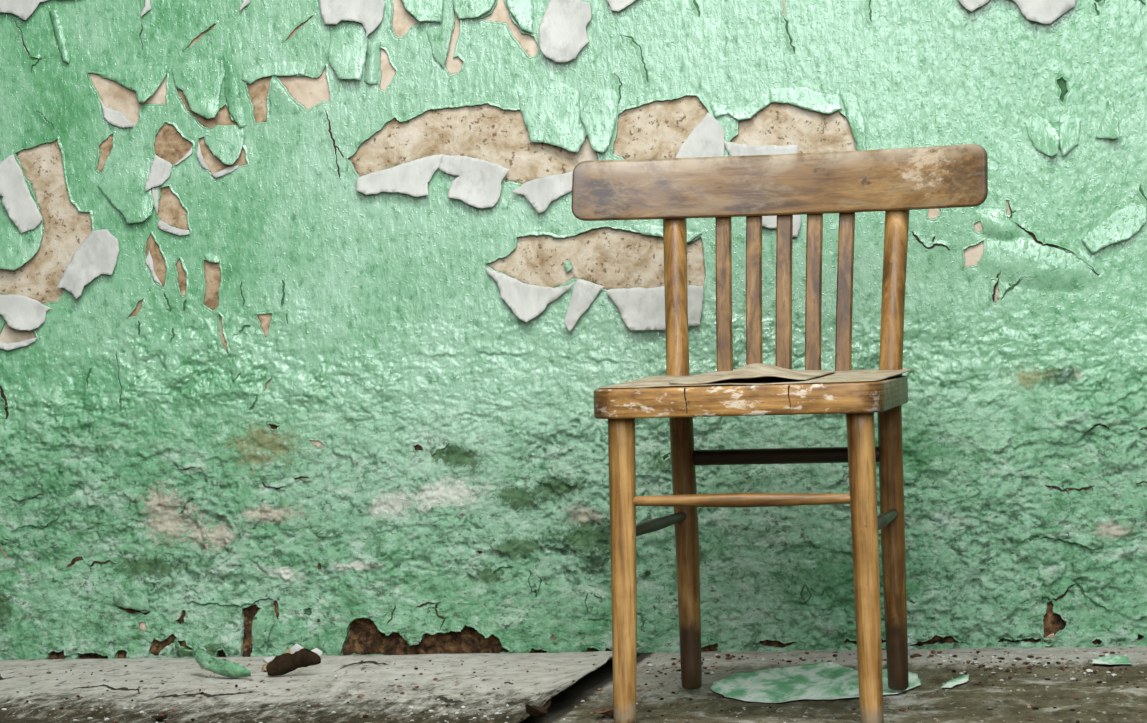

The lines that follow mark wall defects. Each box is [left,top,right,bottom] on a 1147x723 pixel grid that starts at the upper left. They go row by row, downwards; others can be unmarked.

peeling [1013,0,1076,24]
peeling [86,0,591,358]
peeling [345,83,866,213]
peeling [0,135,120,350]
peeling [762,216,777,228]
crack [912,208,951,250]
peeling [483,223,665,332]
peeling [687,230,709,328]
crack [1084,418,1147,432]
crack [1045,480,1094,492]
flaking render [338,598,558,656]
flaking render [996,579,1112,647]